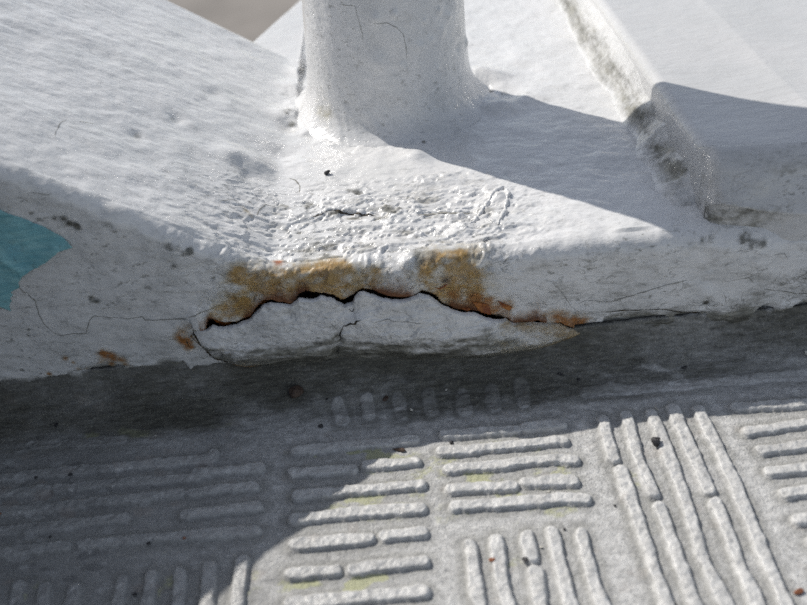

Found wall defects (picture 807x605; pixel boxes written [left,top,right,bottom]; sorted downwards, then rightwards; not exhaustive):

rust [98,350,126,365]
rust [176,330,206,351]
crack [21,284,512,365]
rust [200,258,414,331]
rust [418,248,587,345]
crack [558,281,698,329]